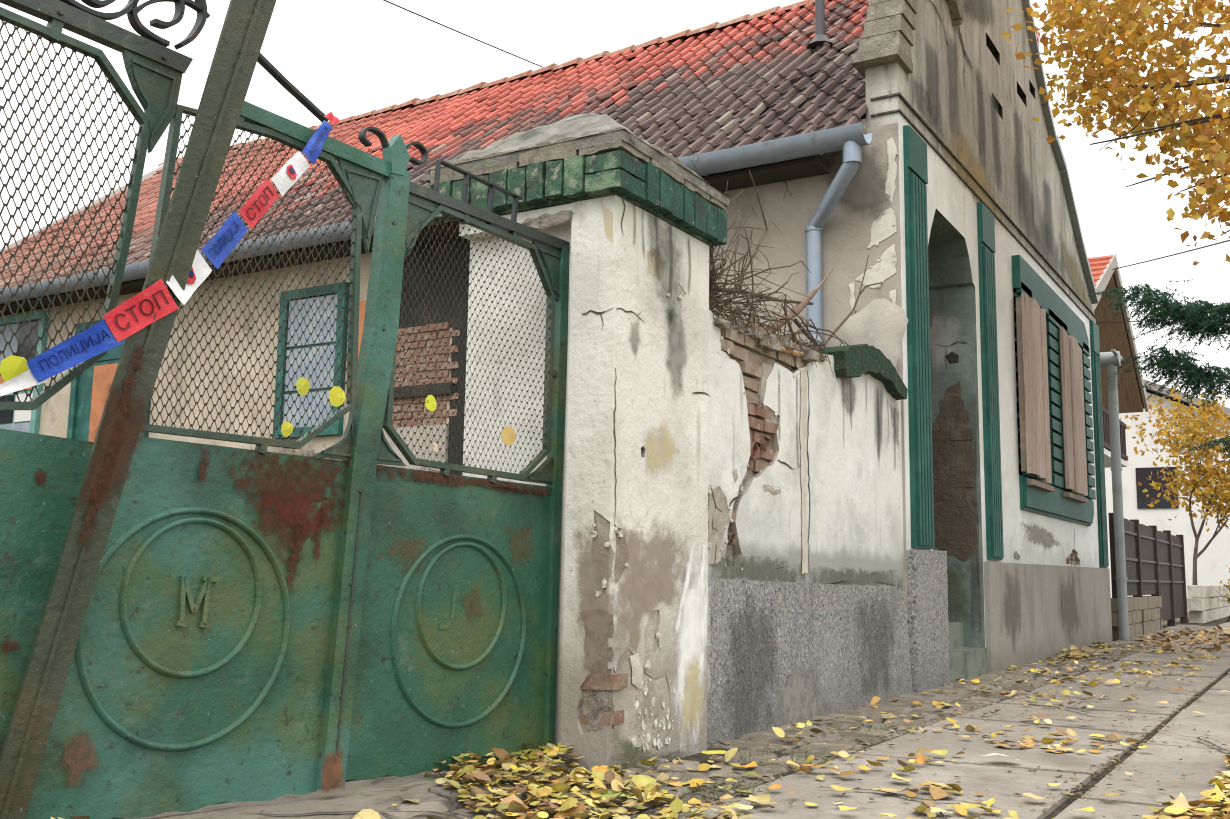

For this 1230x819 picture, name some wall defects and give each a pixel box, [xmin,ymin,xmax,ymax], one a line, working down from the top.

crack [582,308,644,330]
damp [648,214,686,387]
flaking render [849,137,899,309]
spalling [944,352,959,363]
rust [78,346,146,549]
flaking render [591,511,629,597]
spalling [708,324,808,570]
spalling [932,381,979,561]
flaking render [579,610,676,762]